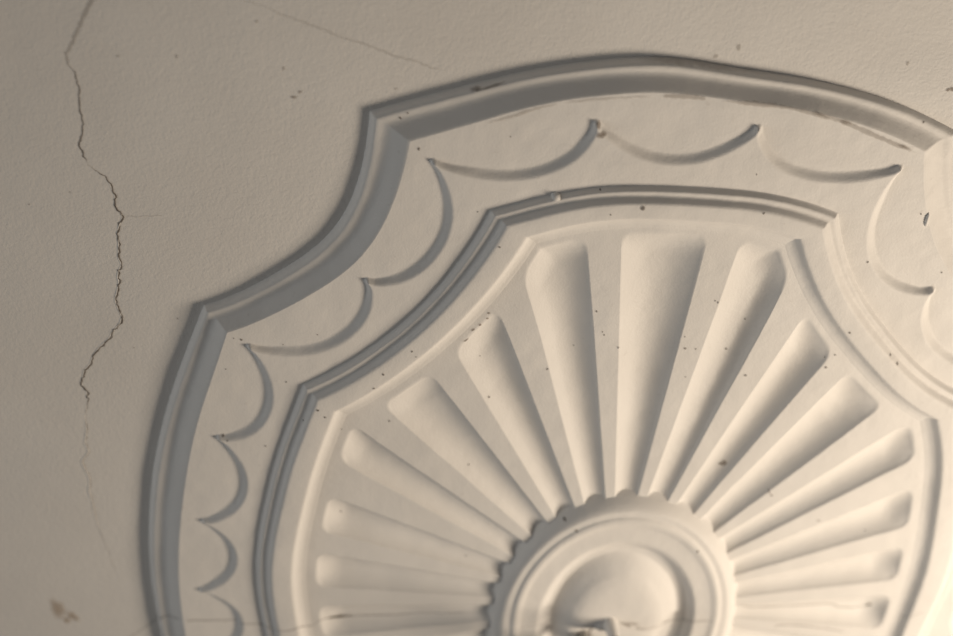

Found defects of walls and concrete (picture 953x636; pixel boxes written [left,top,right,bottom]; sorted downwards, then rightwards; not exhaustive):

crack [75,73,124,529]